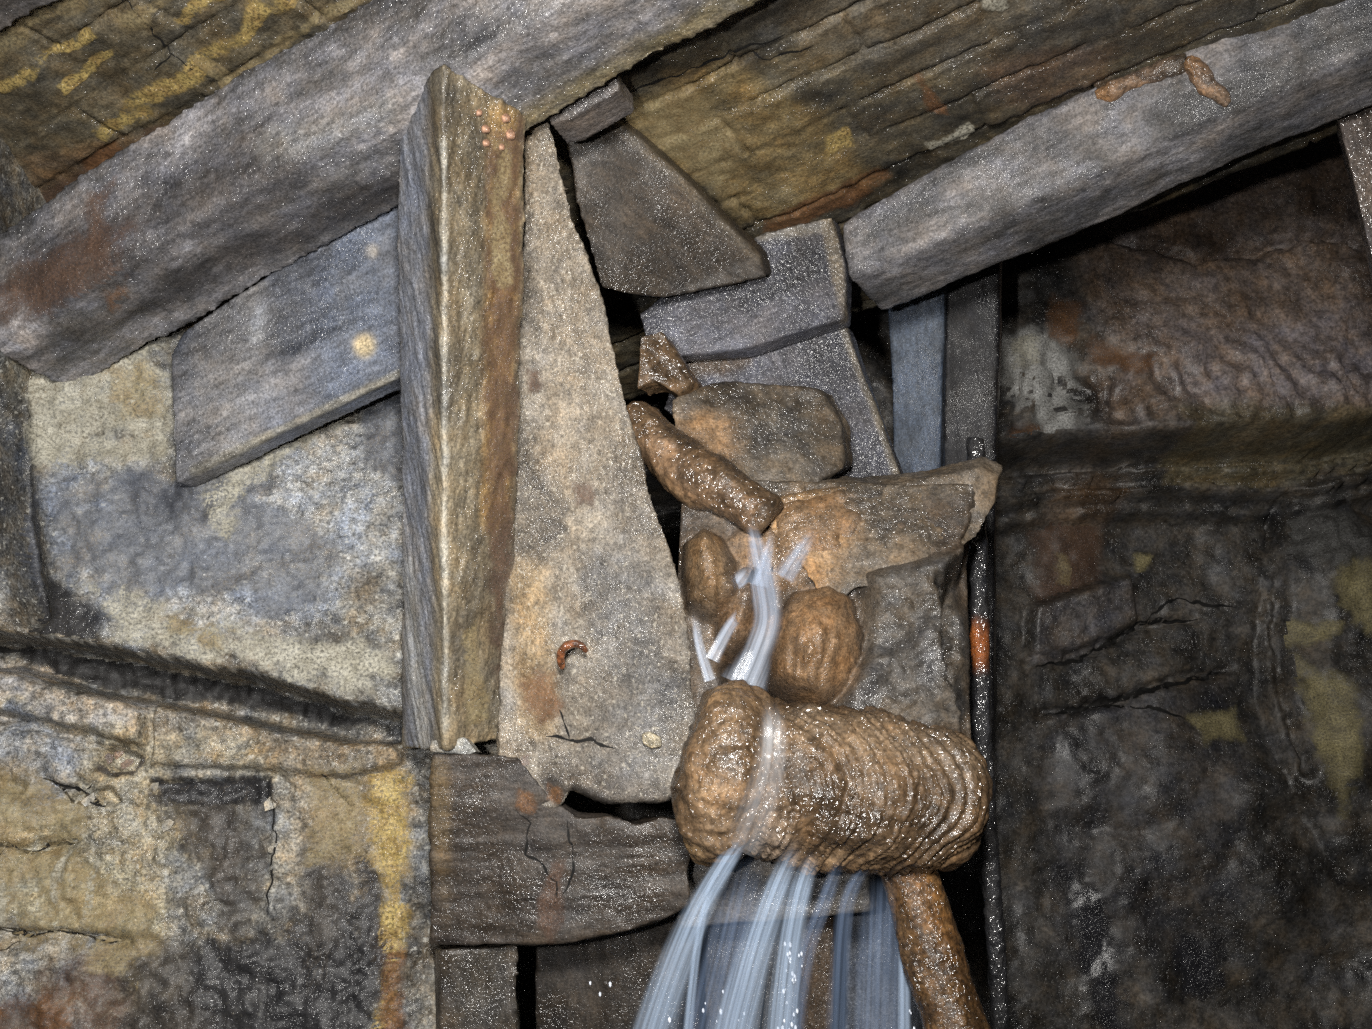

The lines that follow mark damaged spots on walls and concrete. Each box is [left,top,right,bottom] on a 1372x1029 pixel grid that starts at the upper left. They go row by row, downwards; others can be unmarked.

crack [0,927,134,951]
damp [121,834,403,1029]
rust [307,769,414,1029]